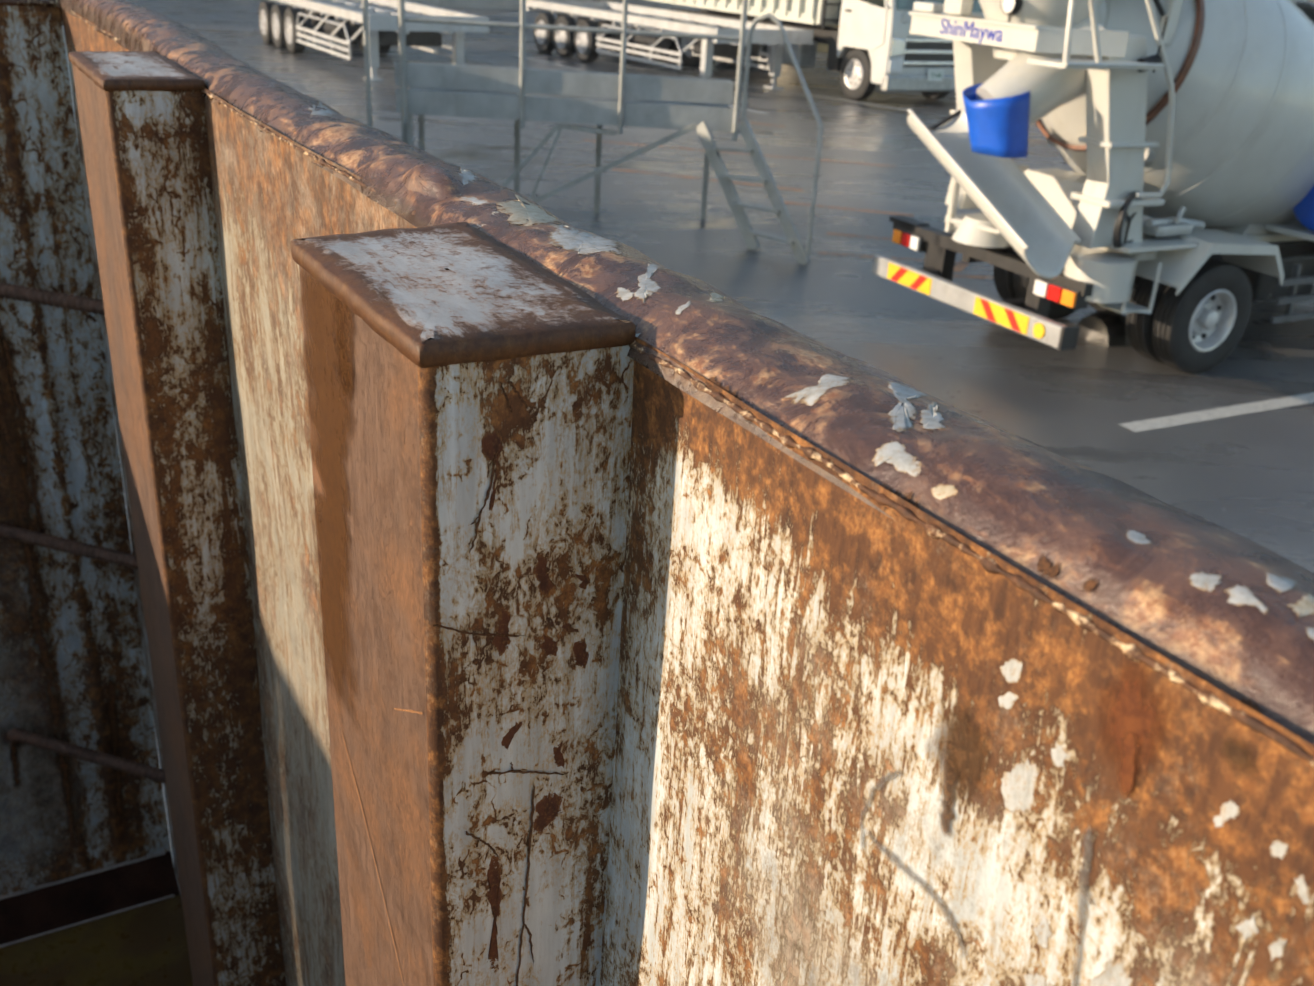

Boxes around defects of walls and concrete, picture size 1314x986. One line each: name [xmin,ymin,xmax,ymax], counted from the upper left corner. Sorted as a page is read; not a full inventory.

peeling [496,191,622,257]
peeling [616,264,661,304]
peeling [784,374,854,406]
peeling [871,382,946,478]
peeling [931,483,958,500]
peeling [1189,572,1269,615]
peeling [1265,573,1314,639]
peeling [998,658,1023,709]
corrosion [2,730,20,787]
peeling [1000,758,1039,815]
peeling [1051,744,1068,768]
crack [465,762,564,986]